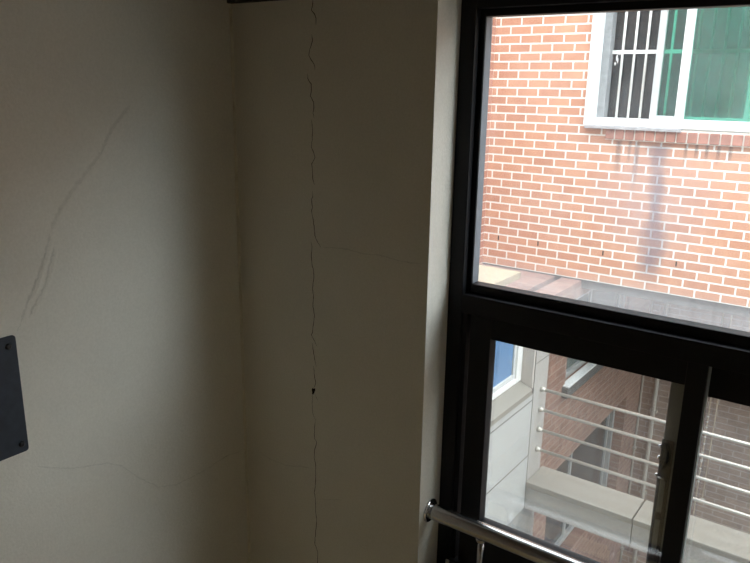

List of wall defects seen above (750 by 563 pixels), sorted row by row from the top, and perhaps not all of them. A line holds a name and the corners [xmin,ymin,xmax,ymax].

crack [307,38,319,563]